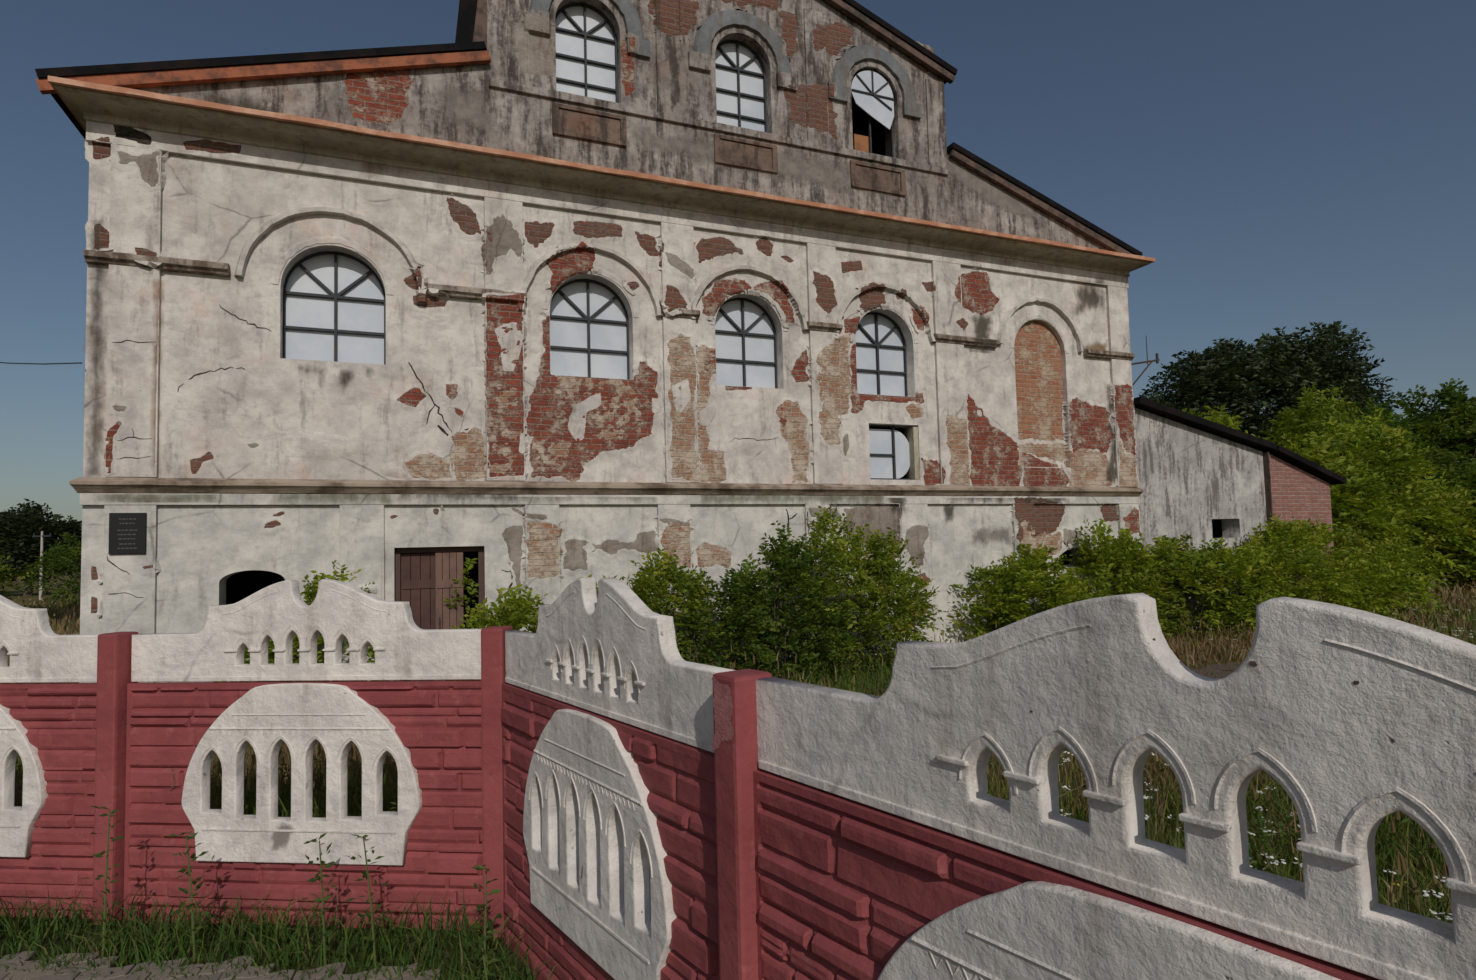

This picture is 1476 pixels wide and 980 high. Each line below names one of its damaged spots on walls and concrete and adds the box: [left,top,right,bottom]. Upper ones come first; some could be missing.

spalling [337,69,419,129]
spalling [621,0,858,143]
crack [408,362,469,436]
spalling [392,191,1141,562]
spalling [497,505,735,594]
spalling [803,499,932,636]